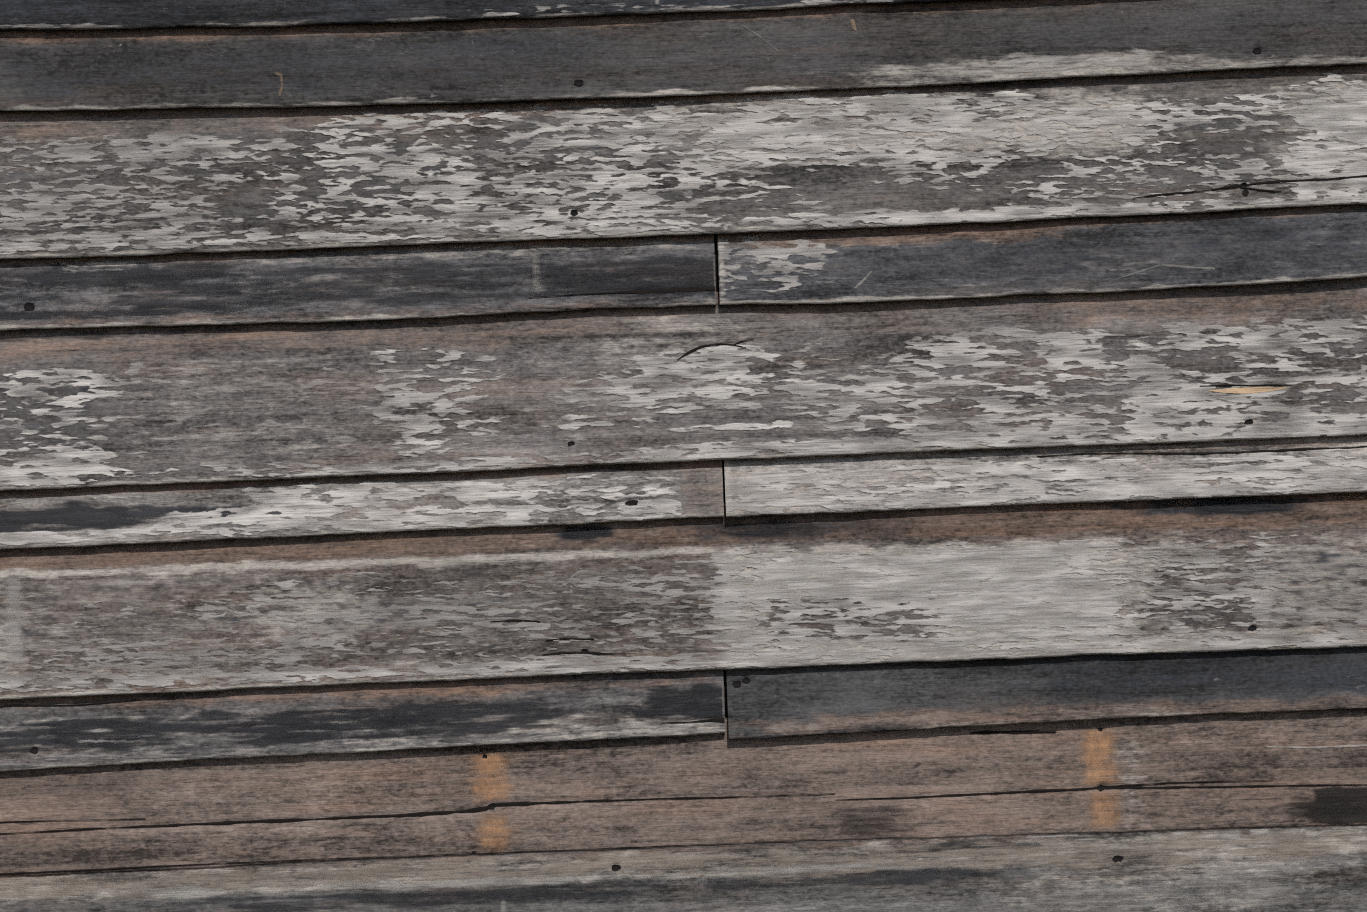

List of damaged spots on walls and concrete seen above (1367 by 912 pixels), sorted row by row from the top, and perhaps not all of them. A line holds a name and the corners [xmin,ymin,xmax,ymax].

peeling [988,50,1150,72]
peeling [0,73,1367,292]
crack [1135,175,1367,198]
peeling [0,316,1367,545]
peeling [0,532,1367,692]
crack [0,780,1367,835]
crack [0,843,727,875]